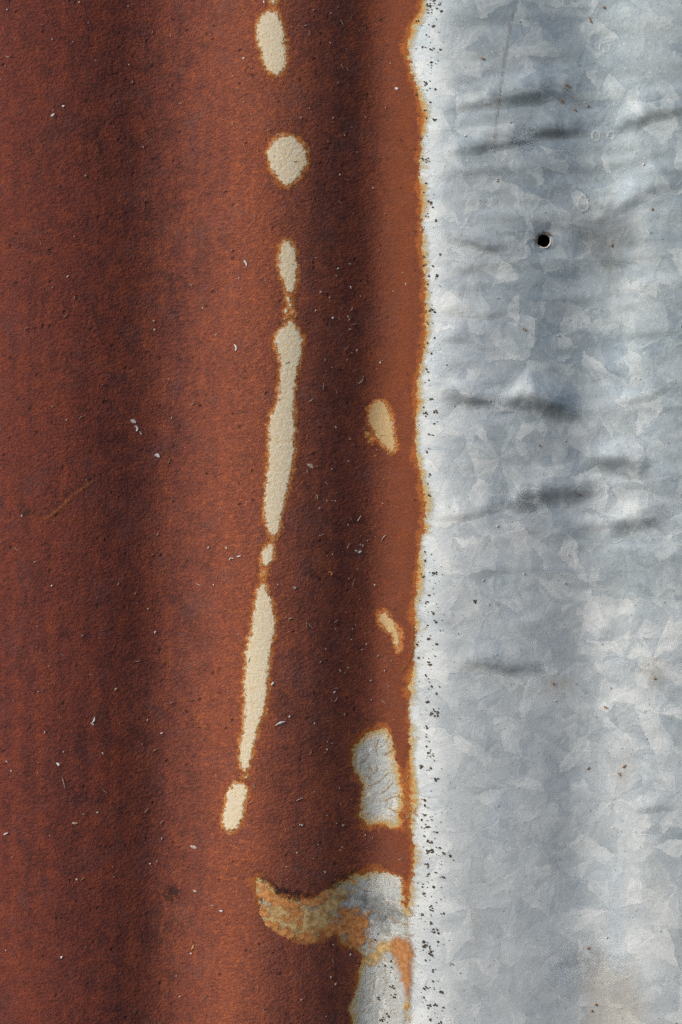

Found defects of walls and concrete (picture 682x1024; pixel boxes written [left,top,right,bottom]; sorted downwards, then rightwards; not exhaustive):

rust [0,0,433,1024]
peeling [255,730,455,1024]